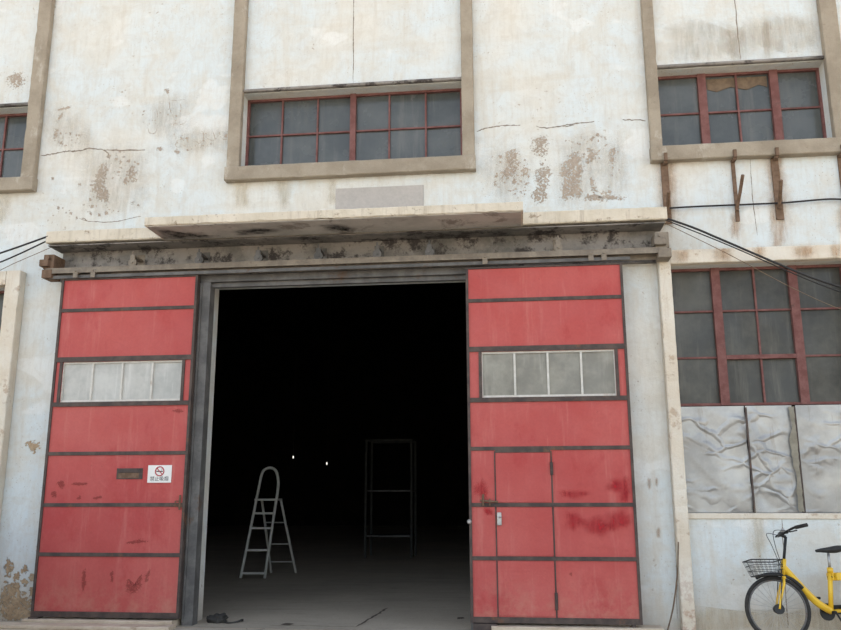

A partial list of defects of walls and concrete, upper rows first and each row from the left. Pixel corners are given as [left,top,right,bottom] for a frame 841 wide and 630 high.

peeling [6,70,28,89]
crack [41,148,145,156]
peeling [78,149,140,216]
crack [477,121,594,132]
peeling [492,133,625,204]
flaking render [0,559,34,621]